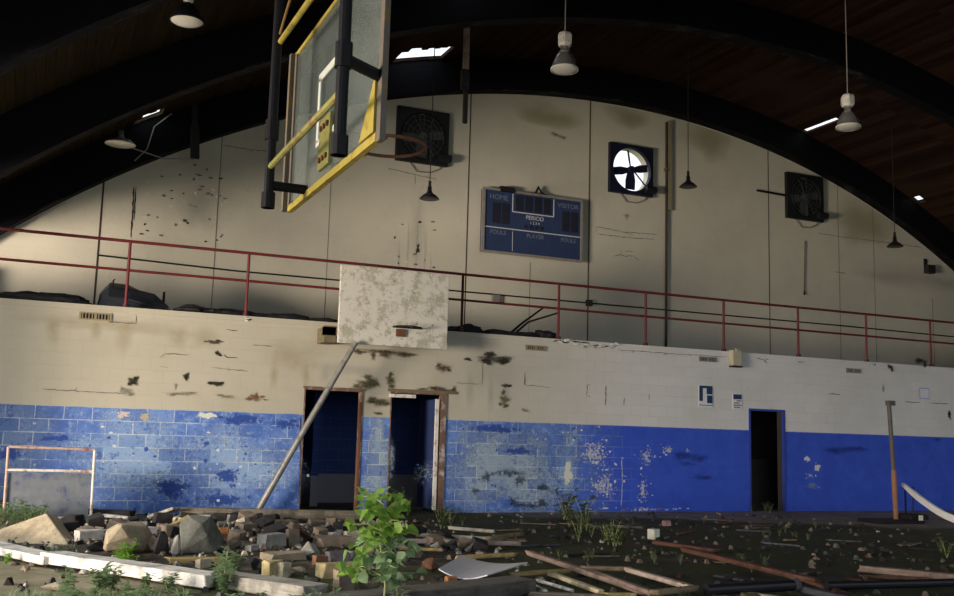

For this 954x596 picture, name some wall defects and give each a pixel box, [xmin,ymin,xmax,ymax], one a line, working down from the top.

peeling [0,405,309,508]
peeling [416,424,689,512]